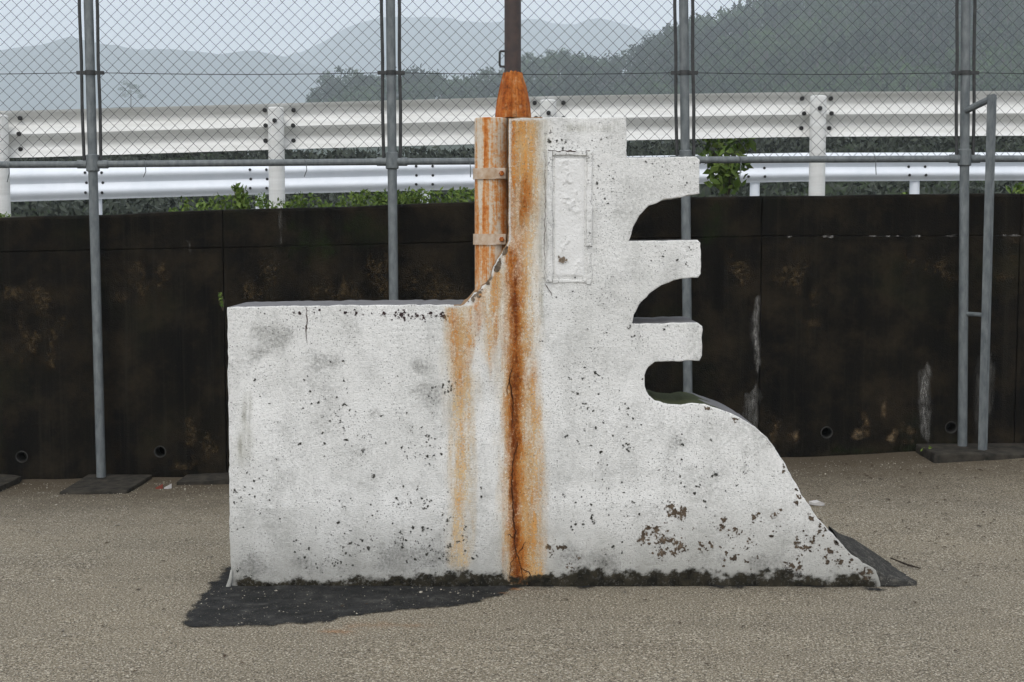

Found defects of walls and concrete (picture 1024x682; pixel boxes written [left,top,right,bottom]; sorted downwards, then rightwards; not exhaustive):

spalling [468,246,508,302]
corrosion [449,121,543,583]
crack [507,370,531,578]
damp [919,365,931,437]